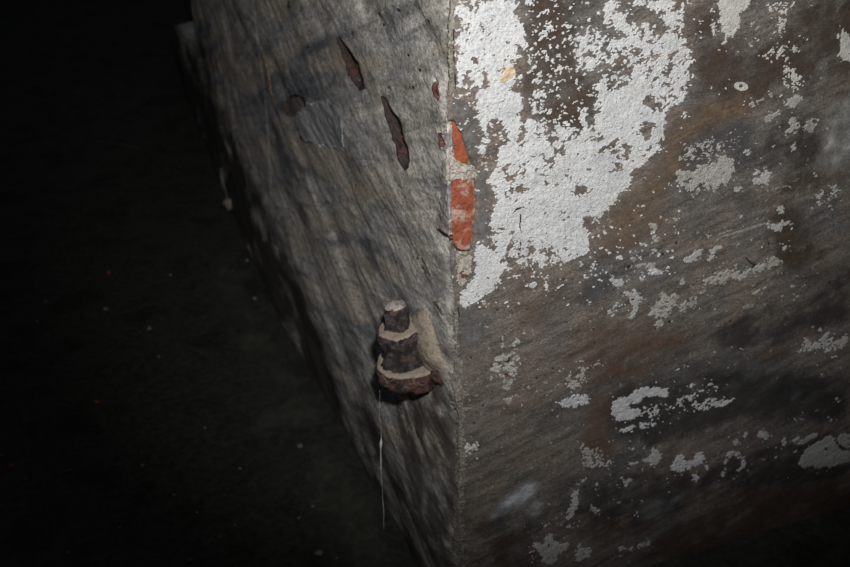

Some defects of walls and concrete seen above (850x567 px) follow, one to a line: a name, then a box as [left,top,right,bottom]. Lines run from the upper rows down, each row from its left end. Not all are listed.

spalling [336,36,366,91]
peeling [743,1,829,152]
peeling [837,28,850,63]
spalling [381,87,410,170]
peeling [432,0,794,345]
peeling [811,184,841,210]
peeling [796,326,849,369]
peeling [552,391,591,411]
peeling [455,439,479,460]
peeling [611,378,735,493]
peeling [718,429,850,481]
peeling [529,443,614,565]